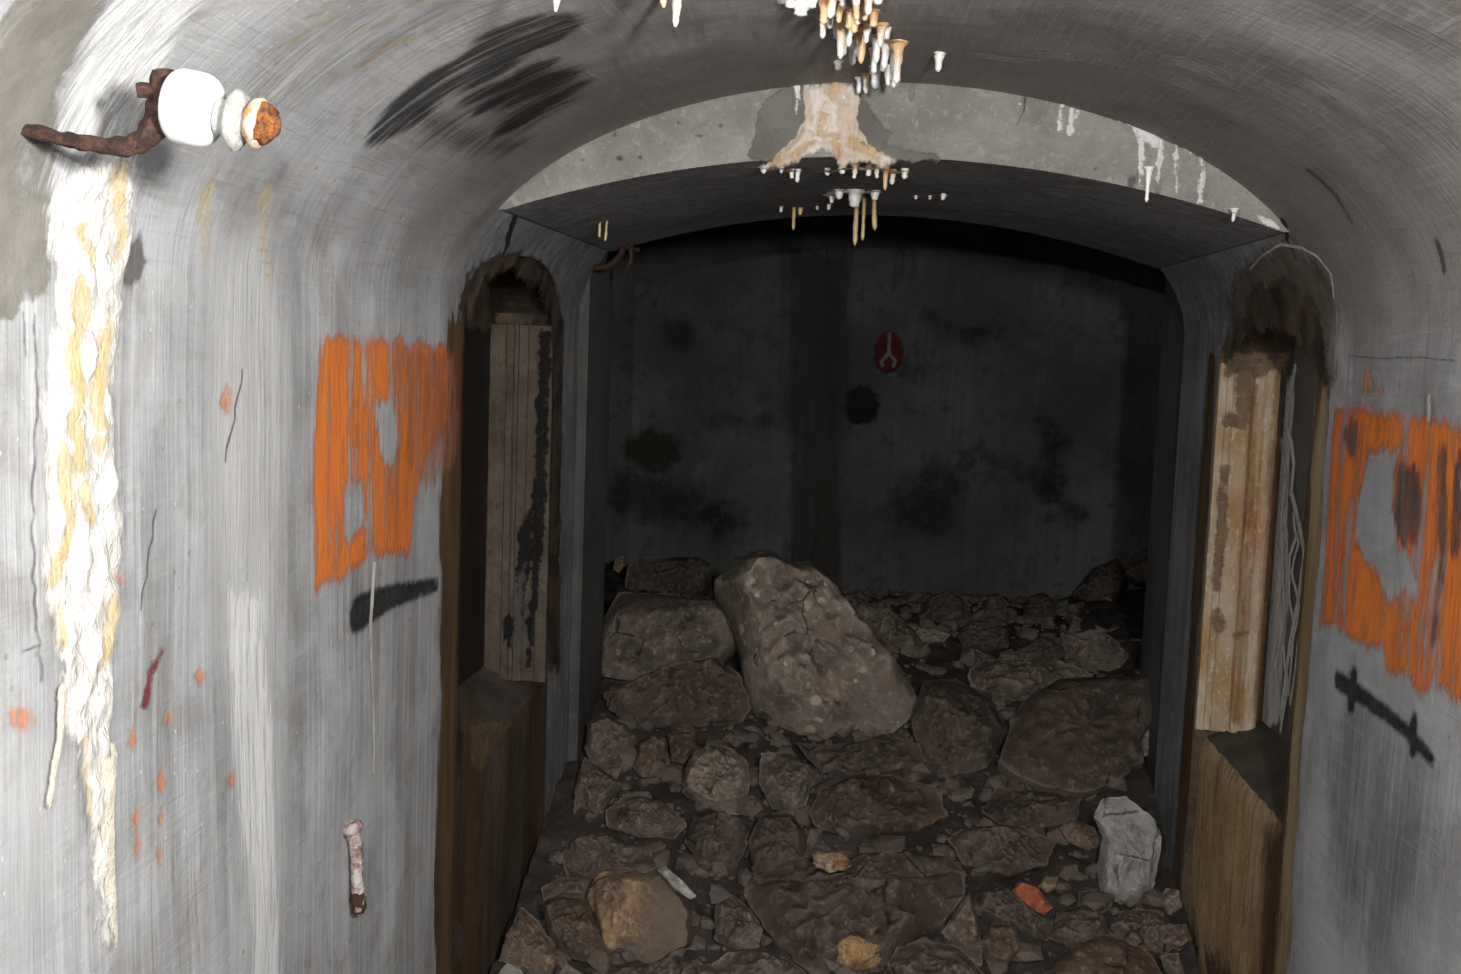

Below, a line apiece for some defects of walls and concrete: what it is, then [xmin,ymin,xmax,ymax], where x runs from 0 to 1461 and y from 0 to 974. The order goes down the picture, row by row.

water stain [368,14,591,150]
flaking render [748,84,815,161]
flaking render [857,94,940,163]
efflorescence [1057,104,1080,136]
efflorescence [1119,121,1206,204]
efflorescence [1257,215,1280,230]
crack [24,323,43,681]
water stain [0,0,201,952]
water stain [213,227,288,974]